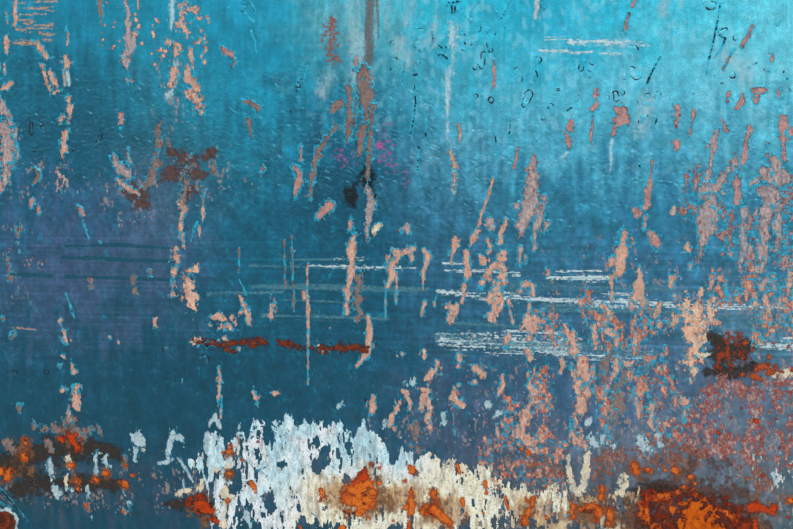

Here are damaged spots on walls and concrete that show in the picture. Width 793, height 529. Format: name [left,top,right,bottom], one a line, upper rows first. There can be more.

peeling [0,0,22,195]
peeling [31,25,76,195]
peeling [96,0,211,117]
peeling [588,87,633,145]
peeling [723,82,785,115]
peeling [107,121,171,199]
peeling [289,53,383,370]
peeling [157,113,793,529]
corrosion [702,331,793,382]
corrosion [0,425,135,498]
corrosion [316,462,468,529]
corrosion [567,451,793,529]